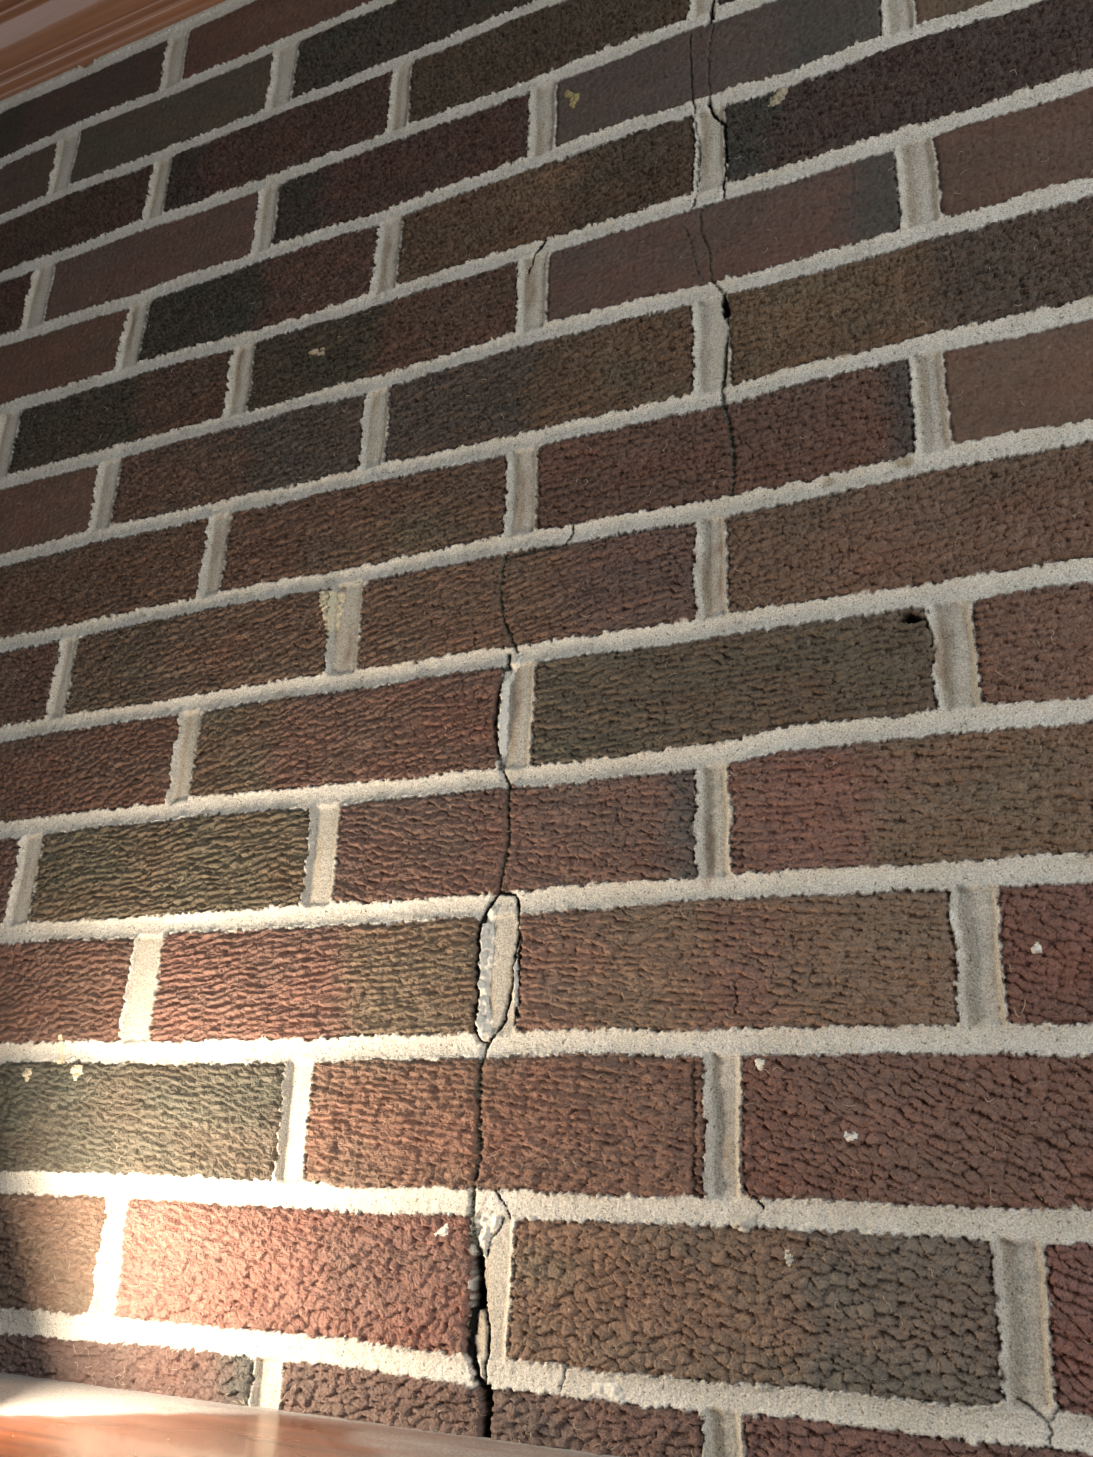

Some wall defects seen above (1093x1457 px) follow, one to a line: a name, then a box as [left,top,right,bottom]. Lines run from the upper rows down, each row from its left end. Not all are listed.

crack [527,239,547,275]
crack [681,0,736,497]
crack [467,525,574,1438]
crack [691,1065,699,1190]
crack [744,1186,765,1210]